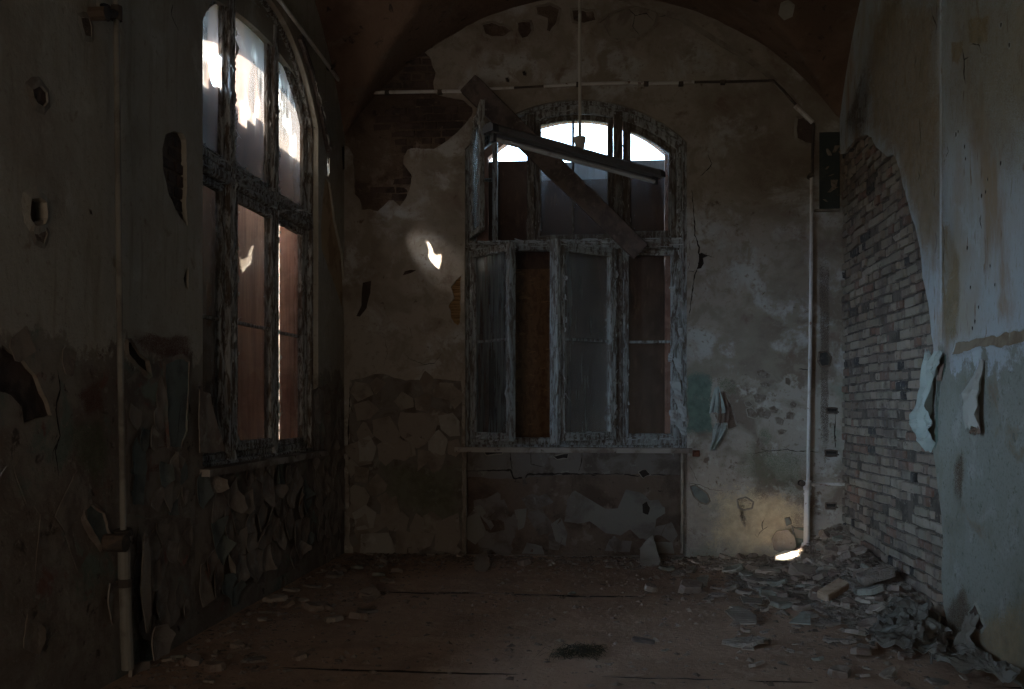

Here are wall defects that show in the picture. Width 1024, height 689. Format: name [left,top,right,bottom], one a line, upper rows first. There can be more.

flaking render [162,132,183,220]
flaking render [341,29,473,211]
crack [688,155,712,313]
peeling [0,348,48,422]
peeling [198,390,225,453]
flaking render [794,115,1024,626]
flaking render [466,452,711,557]
peeling [128,534,176,677]